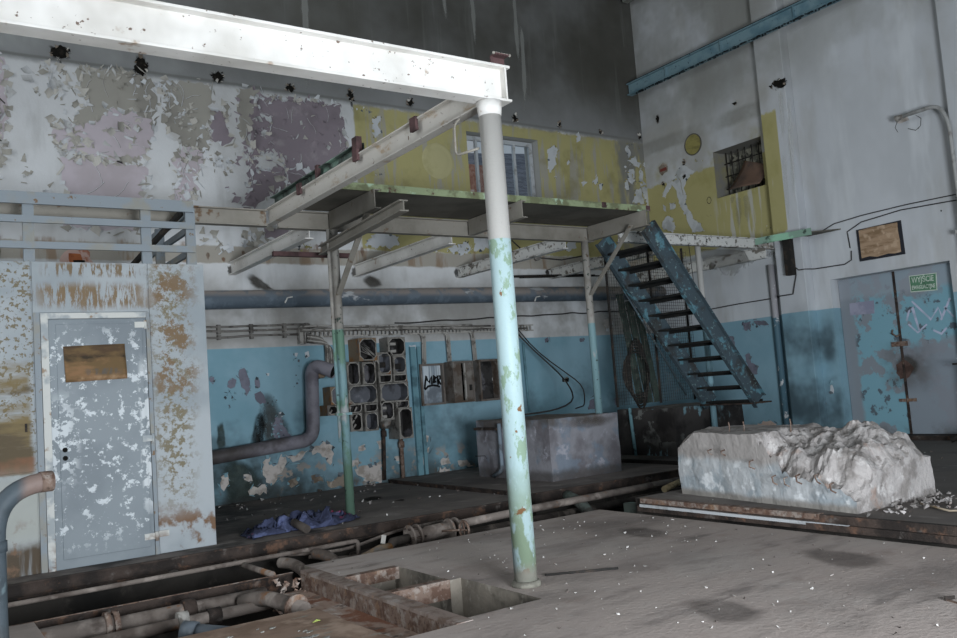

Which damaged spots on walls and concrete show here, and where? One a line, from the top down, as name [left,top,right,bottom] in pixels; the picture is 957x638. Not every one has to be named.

peeling [0,45,382,209]
peeling [61,224,140,236]
peeling [199,225,291,255]
peeling [365,234,400,249]
peeling [436,238,489,256]